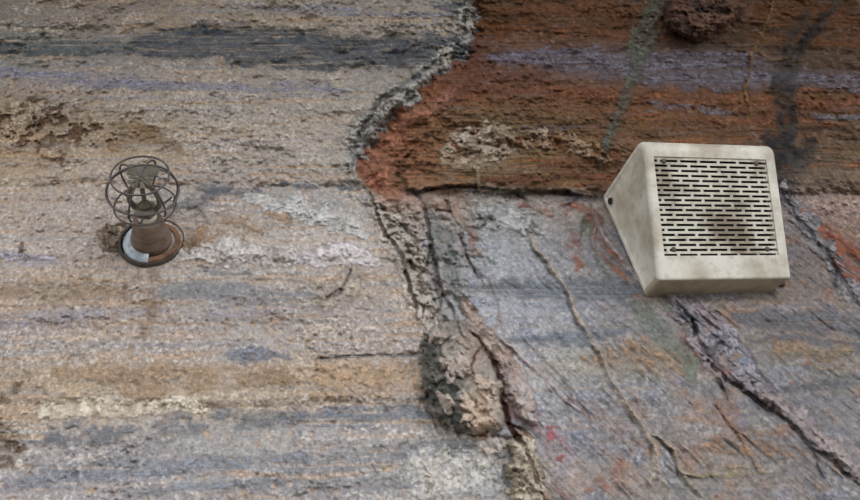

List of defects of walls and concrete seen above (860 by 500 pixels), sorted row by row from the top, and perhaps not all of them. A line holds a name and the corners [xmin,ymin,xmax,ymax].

spalling [338,0,481,184]
water stain [481,2,860,202]
spalling [439,119,614,169]
crack [371,160,484,317]
crack [503,189,525,197]
crack [530,235,596,350]
crack [552,191,595,206]
crack [592,226,640,282]
crack [458,314,543,376]
crack [500,392,541,488]
crack [716,372,803,455]
crack [817,464,849,479]